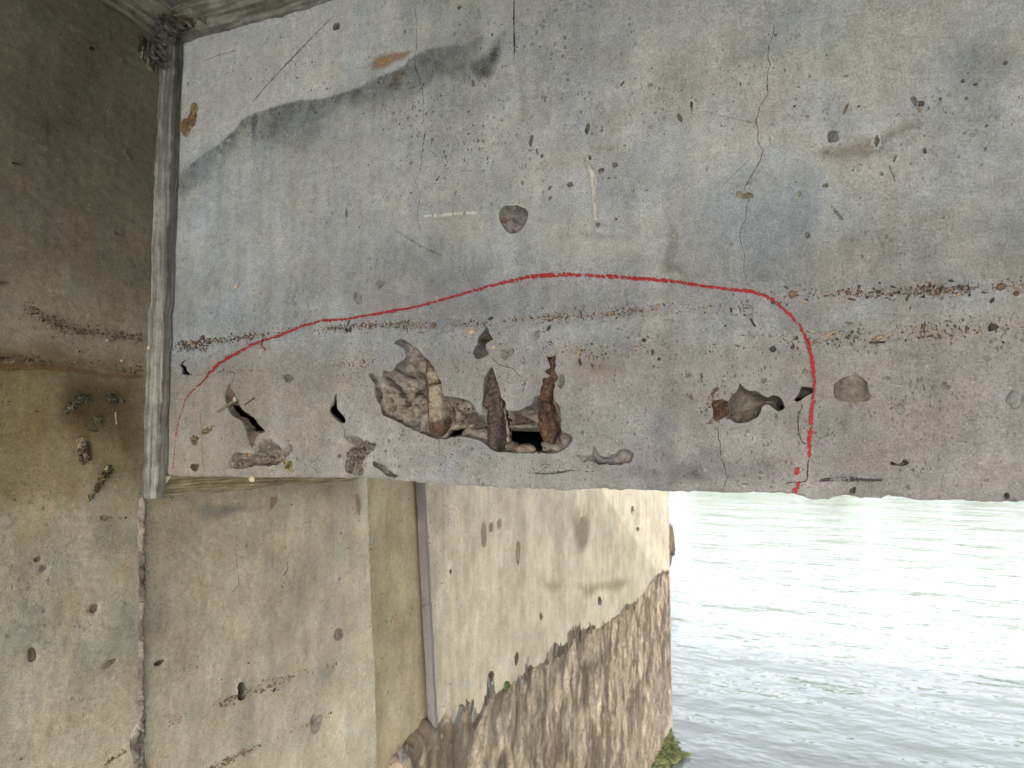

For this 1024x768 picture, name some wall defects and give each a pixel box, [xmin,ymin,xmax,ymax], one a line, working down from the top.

rust [374,54,406,66]
water stain [480,47,498,75]
water stain [269,89,361,128]
spalling [224,379,293,469]
spalling [329,393,399,478]
spalling [369,327,634,465]
rust [699,386,741,430]
spalling [727,369,813,423]